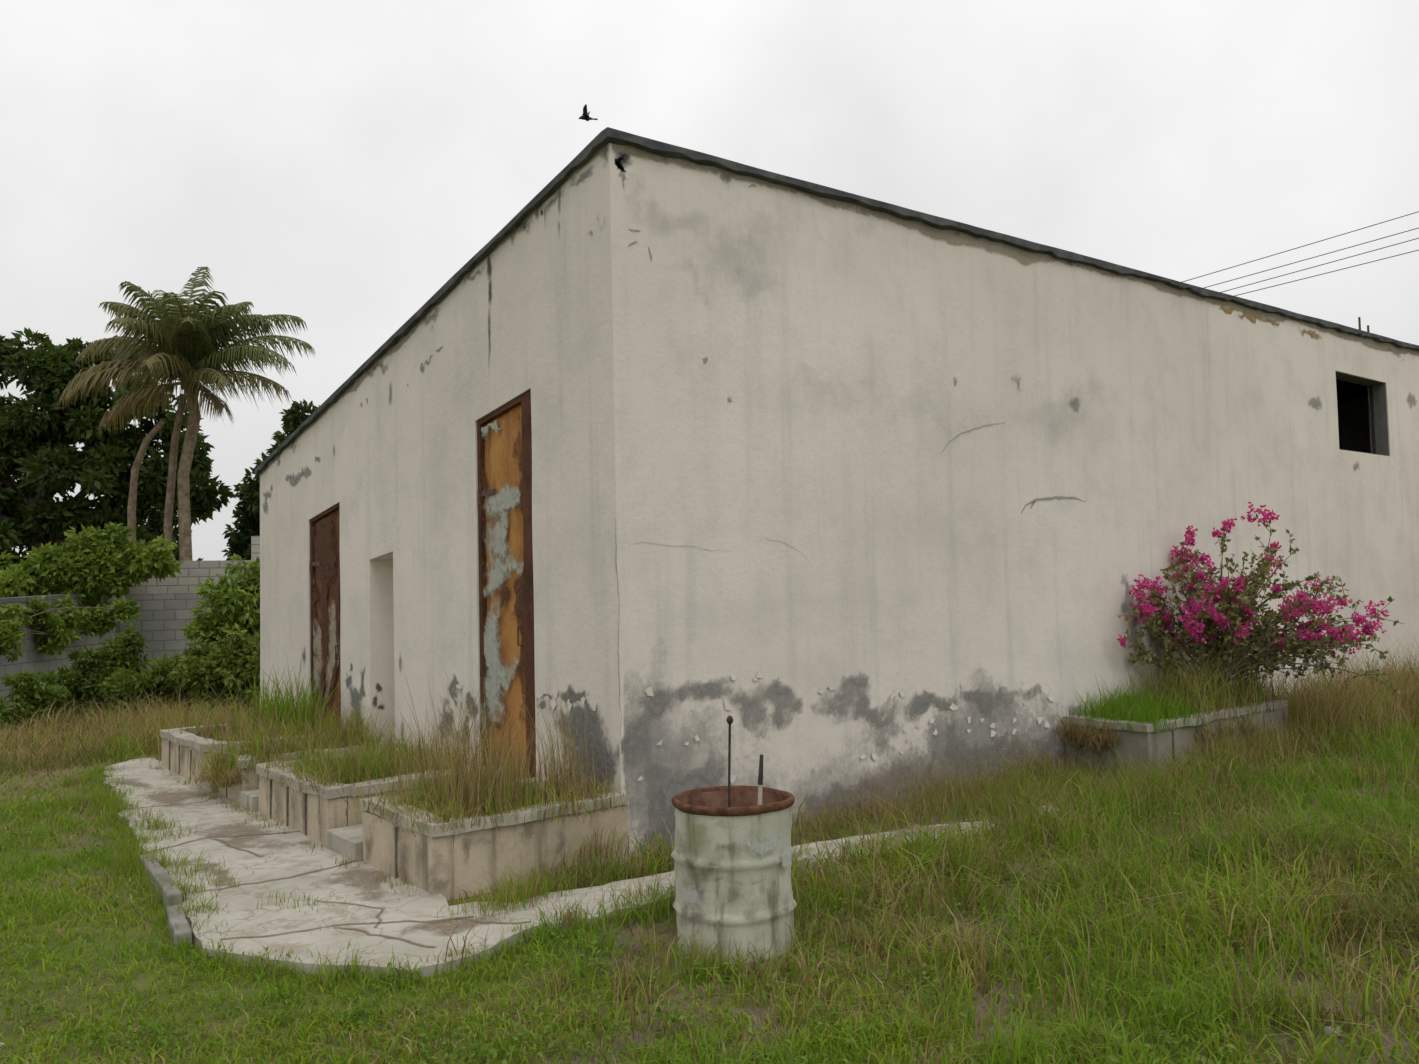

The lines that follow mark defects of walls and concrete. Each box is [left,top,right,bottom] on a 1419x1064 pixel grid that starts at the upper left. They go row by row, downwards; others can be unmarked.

leakage [468,256,491,301]
peeling [260,303,439,512]
peeling [481,420,501,436]
corrosion [312,517,339,707]
leakage [346,664,384,725]
leakage [438,677,487,746]
peeling [483,485,524,722]
corrosion [483,571,526,720]
leakage [539,670,801,853]
leakage [794,675,1064,817]